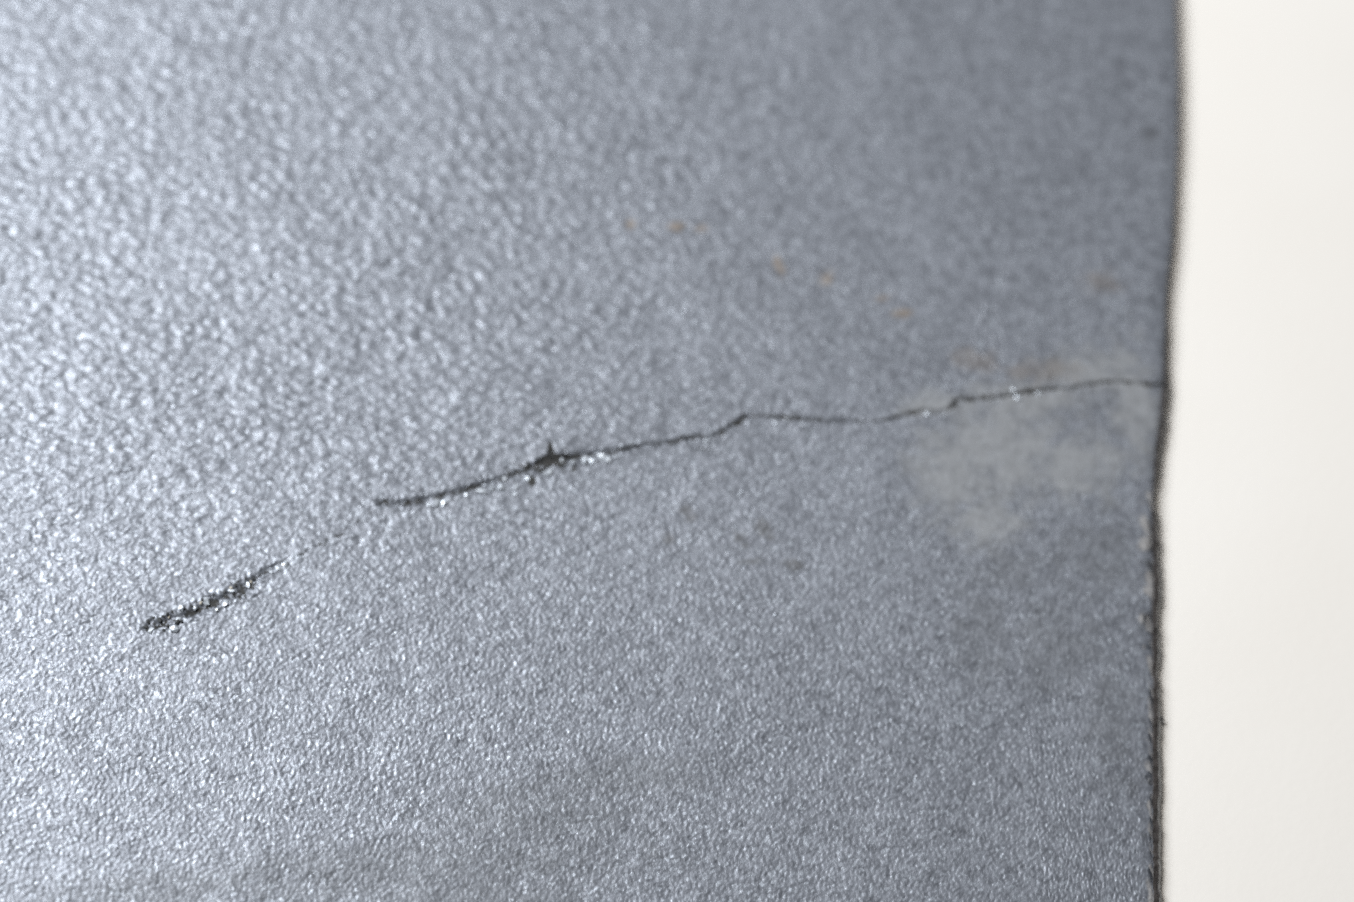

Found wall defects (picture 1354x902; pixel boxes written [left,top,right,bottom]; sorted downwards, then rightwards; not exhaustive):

crack [143,371,1165,634]